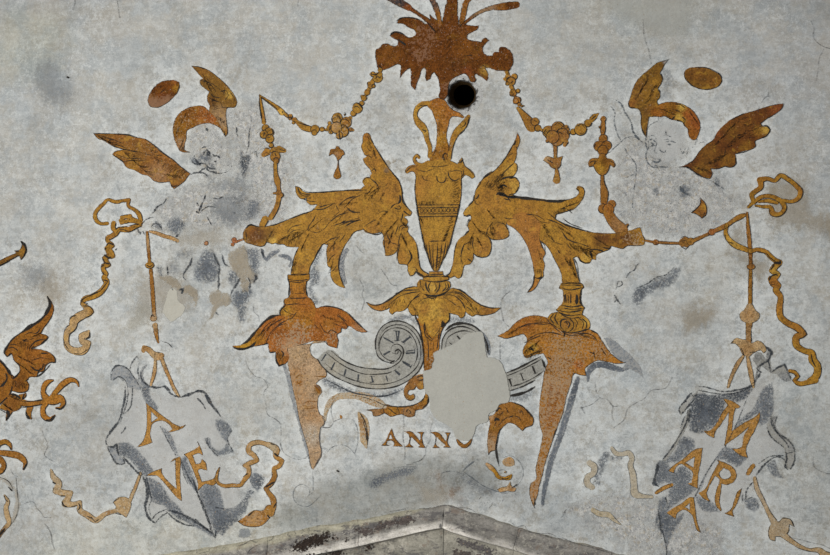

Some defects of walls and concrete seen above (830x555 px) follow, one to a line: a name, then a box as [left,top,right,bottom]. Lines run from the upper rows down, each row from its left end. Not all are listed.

peeling [160,276,198,306]
peeling [210,290,231,319]